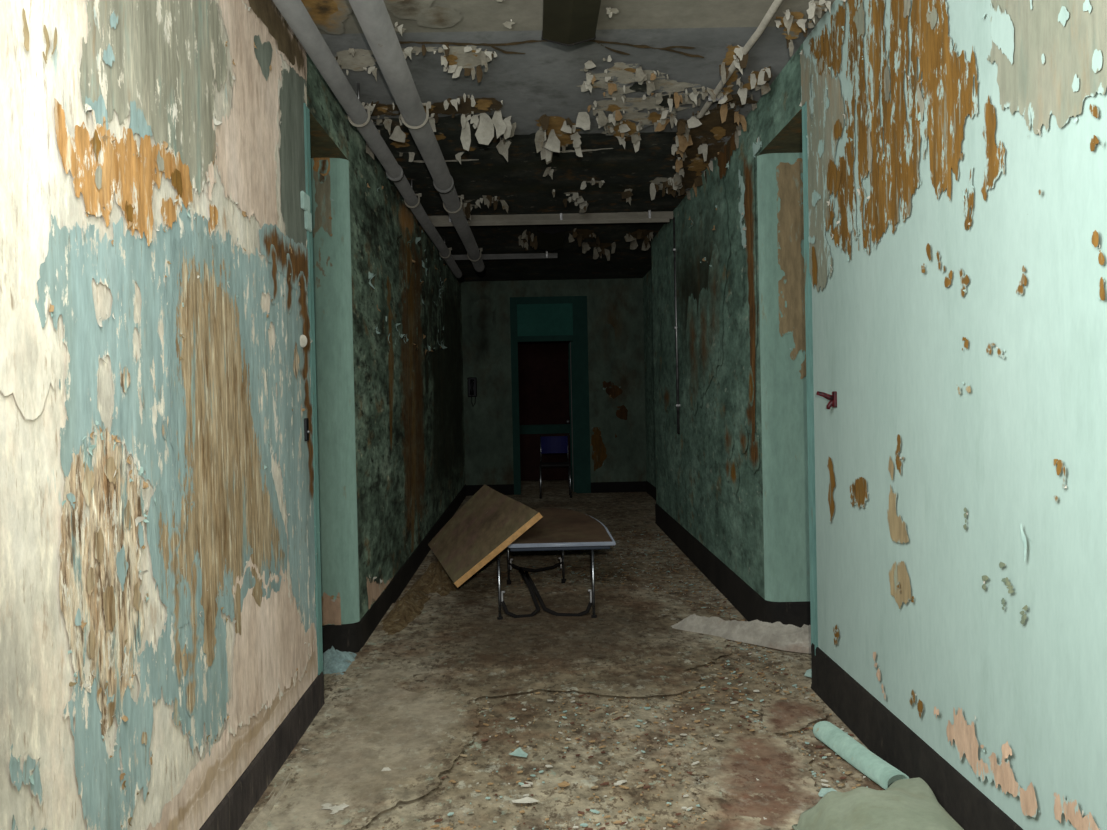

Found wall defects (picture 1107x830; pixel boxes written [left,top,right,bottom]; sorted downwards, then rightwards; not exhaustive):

peeling [394,22,497,83]
peeling [362,101,421,162]
water stain [388,146,449,215]
peeling [423,93,516,164]
peeling [535,43,772,248]
peeling [774,0,1107,379]
water stain [439,133,730,415]
peeling [35,0,341,830]
water stain [146,229,288,717]
peeling [850,477,868,509]
peeling [887,434,909,544]
spalling [909,689,1040,818]